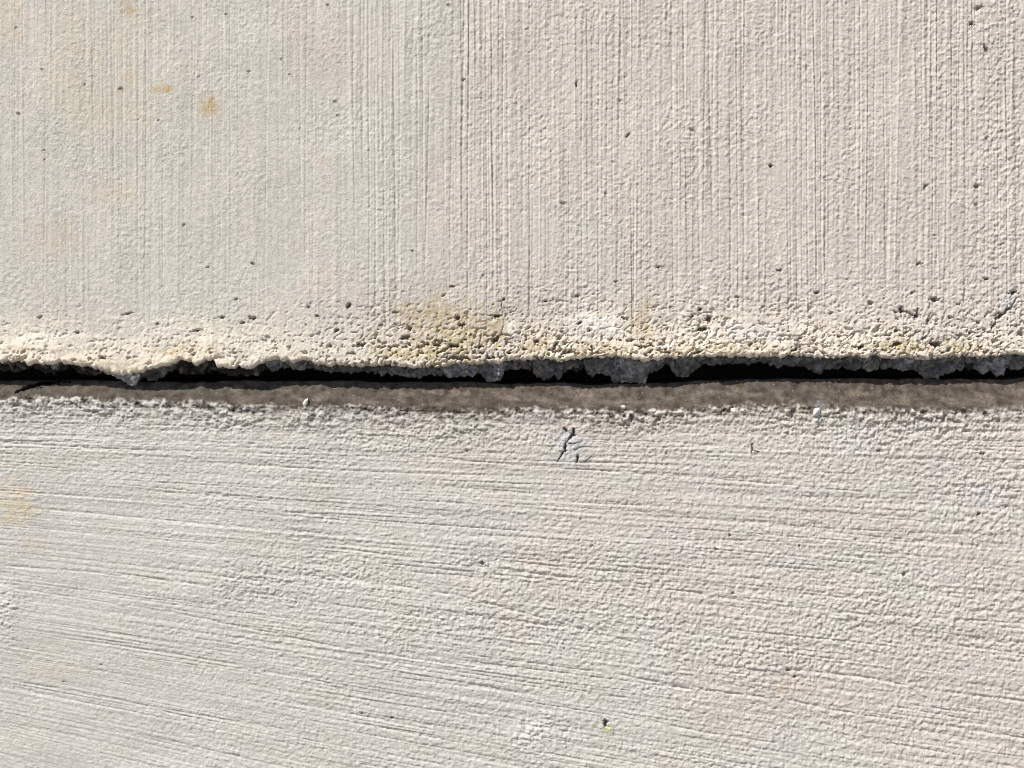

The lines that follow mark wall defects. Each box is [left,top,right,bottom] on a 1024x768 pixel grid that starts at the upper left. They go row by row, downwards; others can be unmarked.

spalling [0,290,1024,386]
crack [556,426,594,465]